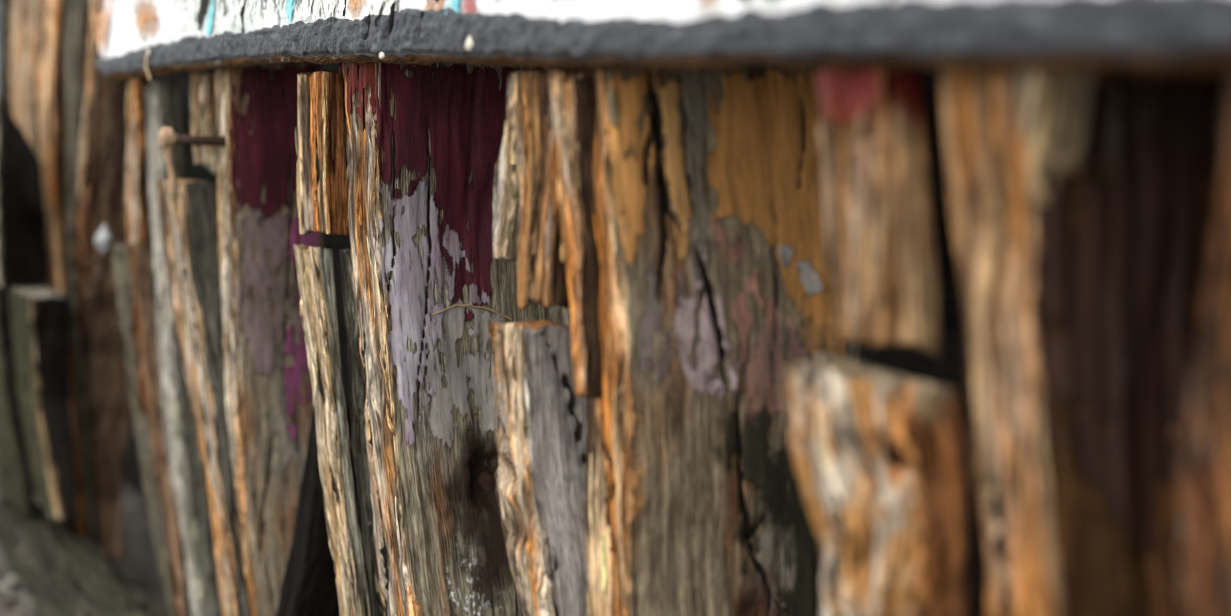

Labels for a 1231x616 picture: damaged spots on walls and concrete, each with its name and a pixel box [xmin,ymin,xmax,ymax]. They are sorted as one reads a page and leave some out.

peeling [186,0,253,33]
peeling [374,0,397,23]
corrosion [162,147,177,194]
peeling [339,63,541,448]
crack [644,77,792,616]